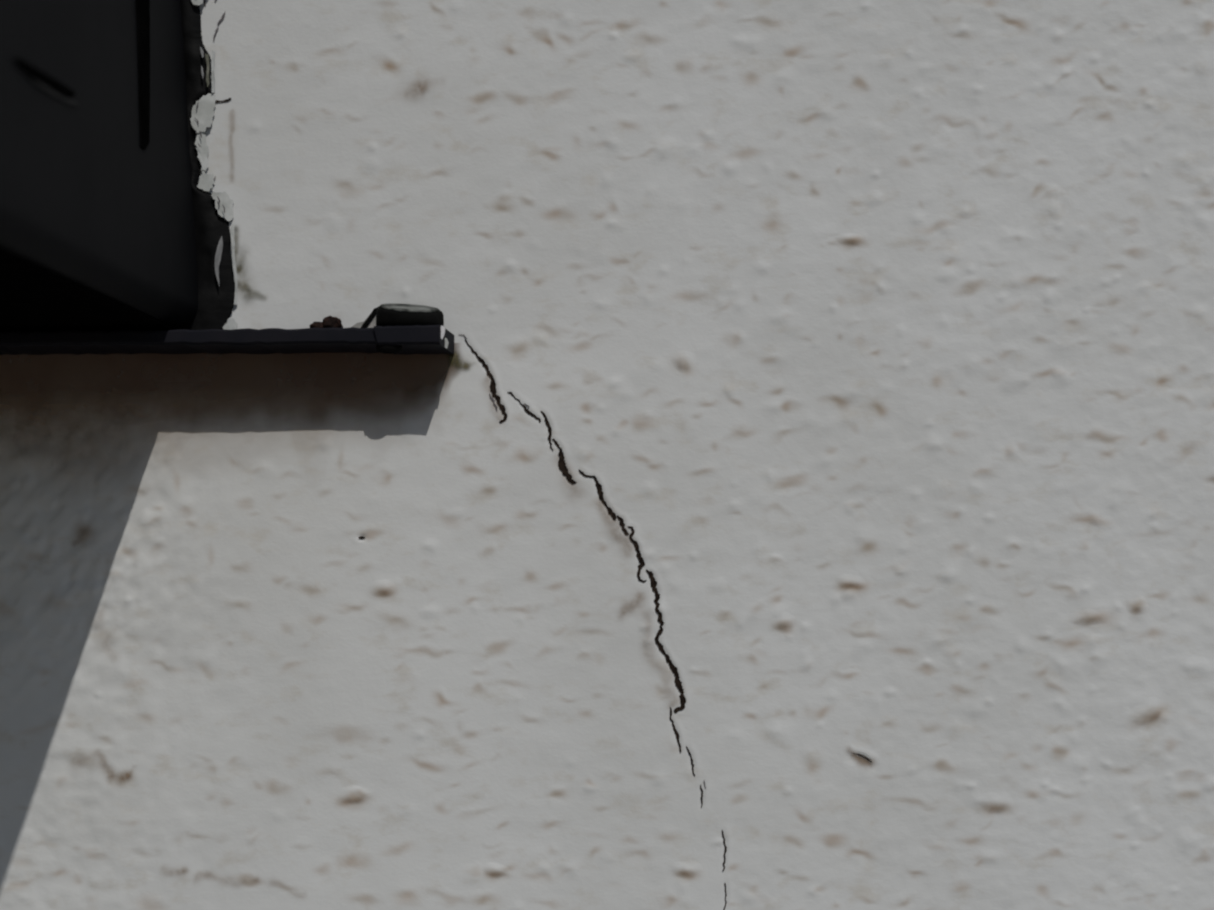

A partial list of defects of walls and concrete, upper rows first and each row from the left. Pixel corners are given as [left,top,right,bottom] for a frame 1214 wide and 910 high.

crack [458,334,706,808]
crack [720,830,728,910]